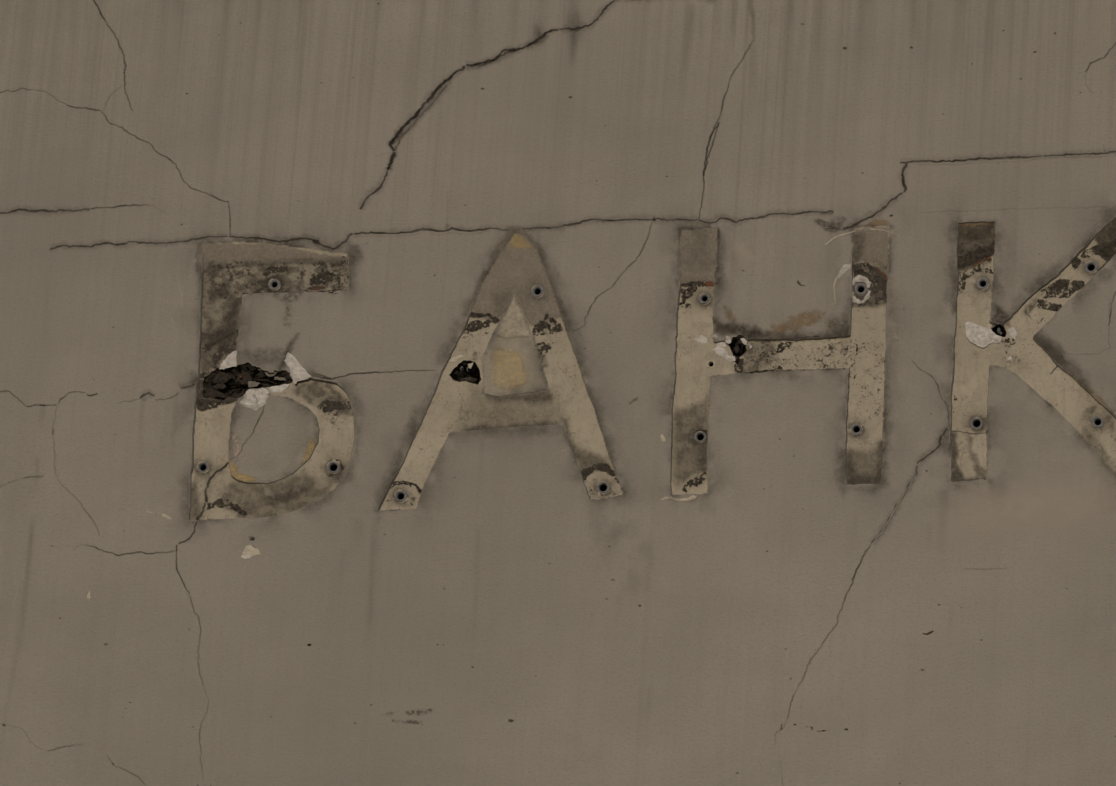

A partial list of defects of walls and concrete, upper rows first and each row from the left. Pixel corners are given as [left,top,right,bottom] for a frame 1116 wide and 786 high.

crack [55,0,1116,250]
crack [0,207,48,215]
spalling [201,351,312,411]
crack [176,463,229,587]
crack [872,428,971,544]